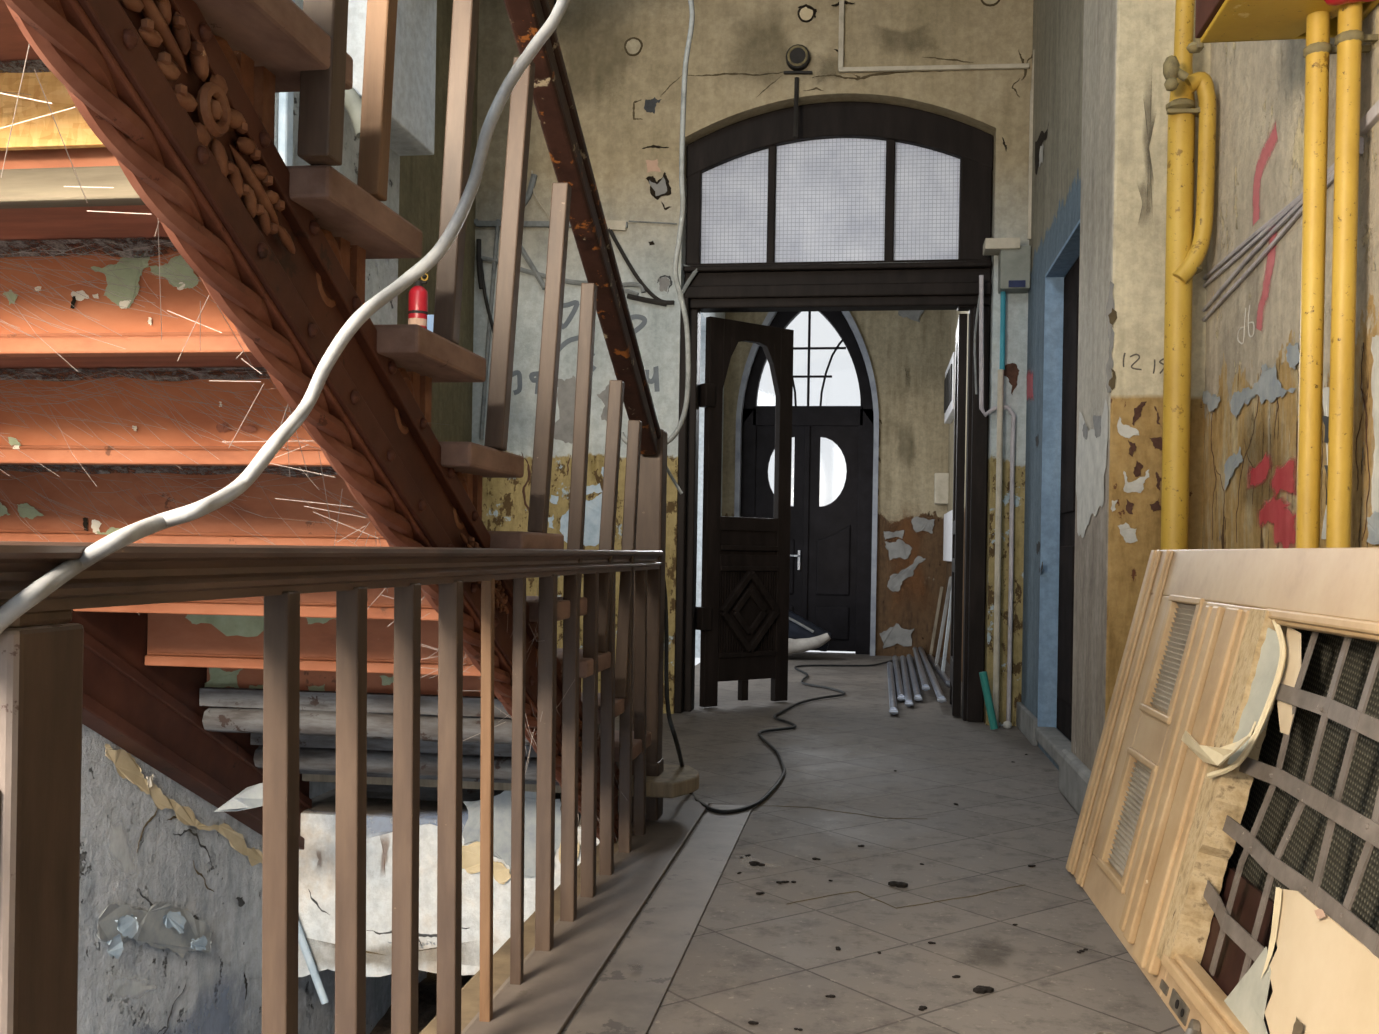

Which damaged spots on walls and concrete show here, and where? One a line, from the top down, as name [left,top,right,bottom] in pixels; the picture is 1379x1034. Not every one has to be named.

crack [662,49,973,97]
spalling [642,145,671,210]
peeling [70,252,199,309]
peeling [1076,281,1162,543]
peeling [1224,447,1243,490]
peeling [1202,343,1299,418]
spalling [1321,387,1329,540]
peeling [1367,335,1379,545]
peeling [548,467,604,546]
peeling [883,517,935,592]
peeling [879,623,914,649]
spalling [105,743,263,866]